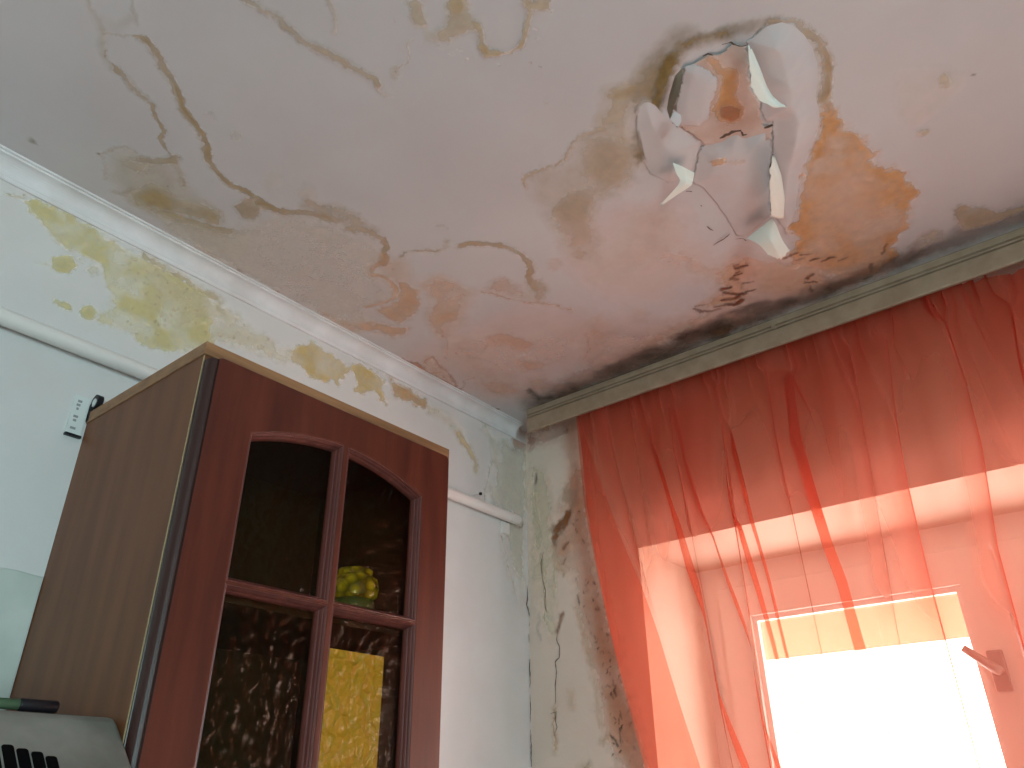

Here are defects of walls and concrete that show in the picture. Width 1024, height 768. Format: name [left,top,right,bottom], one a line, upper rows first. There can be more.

damp [442,0,550,57]
damp [27,200,112,275]
damp [117,253,268,352]
damp [134,35,418,321]
damp [458,241,538,291]
peeling [634,19,823,260]
damp [529,19,935,405]
damp [955,206,1024,229]
damp [293,343,427,408]
damp [553,471,585,567]
crack [526,555,560,767]
damp [579,572,643,768]